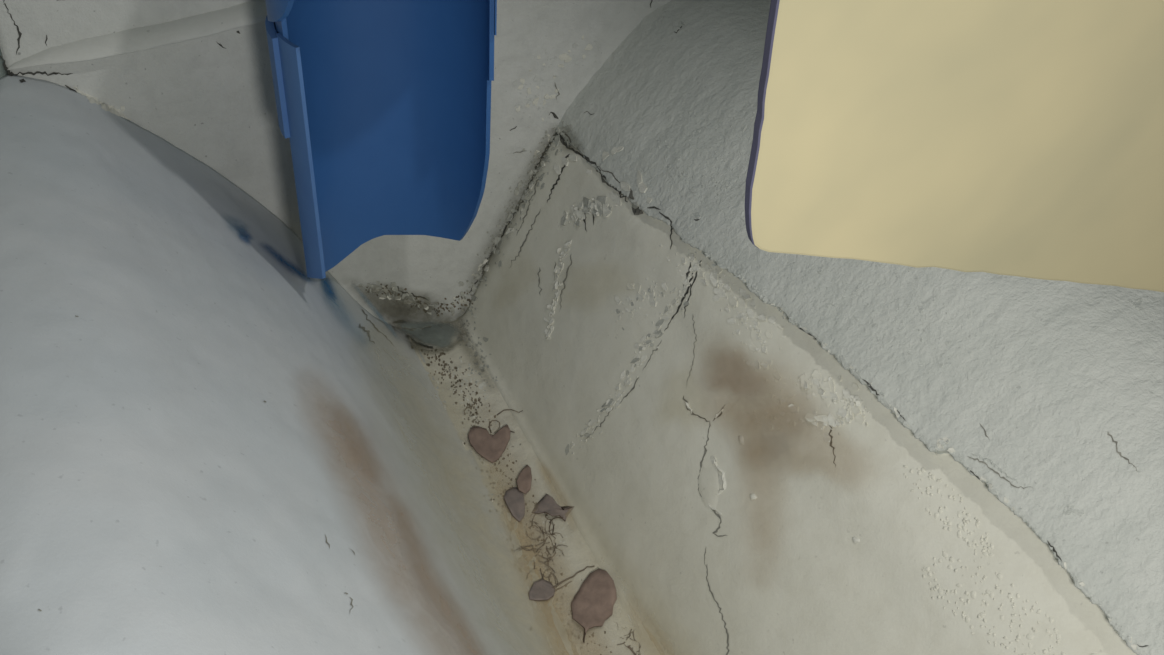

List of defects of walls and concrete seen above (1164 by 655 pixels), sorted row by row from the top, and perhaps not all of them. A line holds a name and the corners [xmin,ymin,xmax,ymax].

crack [0,0,132,120]
peeling [359,112,572,391]
peeling [561,196,617,230]
crack [554,131,701,249]
crack [683,316,730,655]